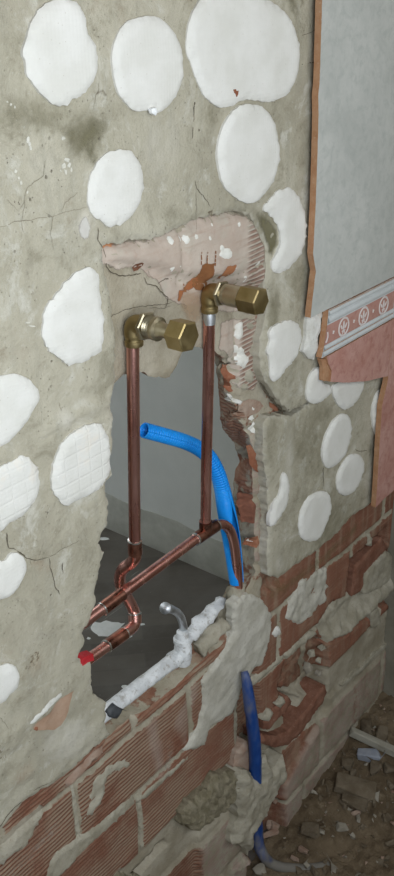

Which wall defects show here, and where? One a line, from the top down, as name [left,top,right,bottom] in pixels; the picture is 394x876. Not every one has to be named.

crack [1,160,86,249]
spalling [102,212,265,307]
corrosion [178,251,236,301]
spalling [218,305,279,433]
spalling [236,492,256,524]
crack [7,535,80,594]
spalling [346,535,393,596]
spalling [30,692,73,731]
spalling [258,676,327,748]
spalling [227,724,249,771]